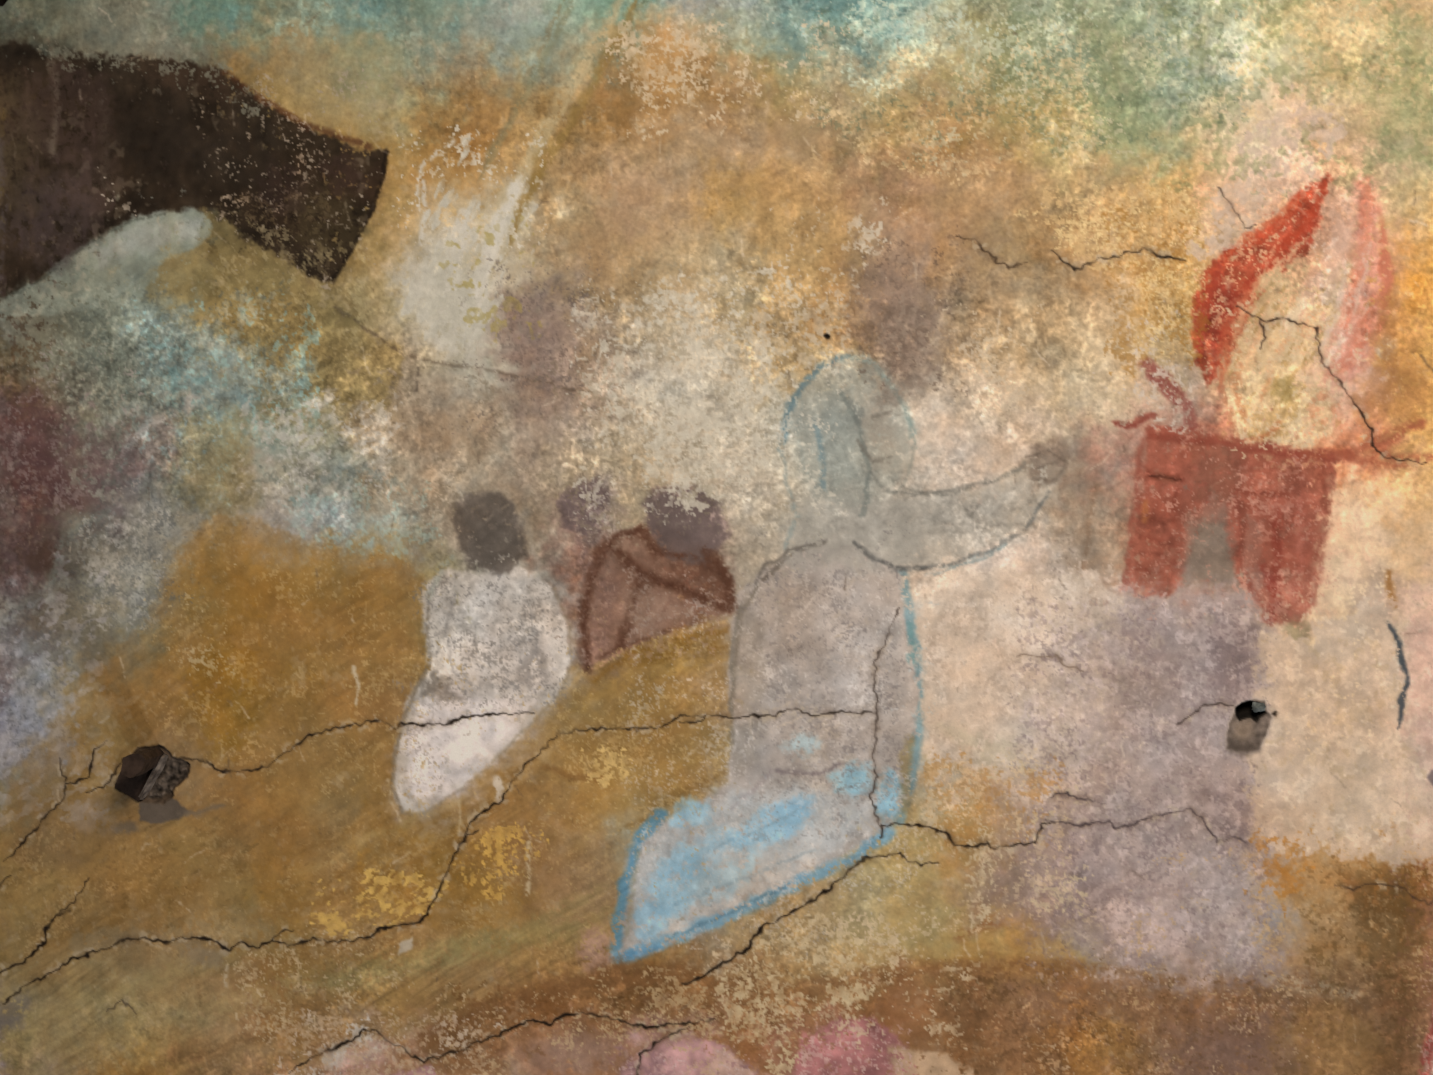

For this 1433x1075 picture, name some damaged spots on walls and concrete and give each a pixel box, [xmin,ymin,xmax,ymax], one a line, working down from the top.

crack [1217,186,1259,231]
crack [955,235,1189,273]
crack [1236,304,1428,467]
spalling [1236,701,1268,723]
crack [0,608,1248,1075]